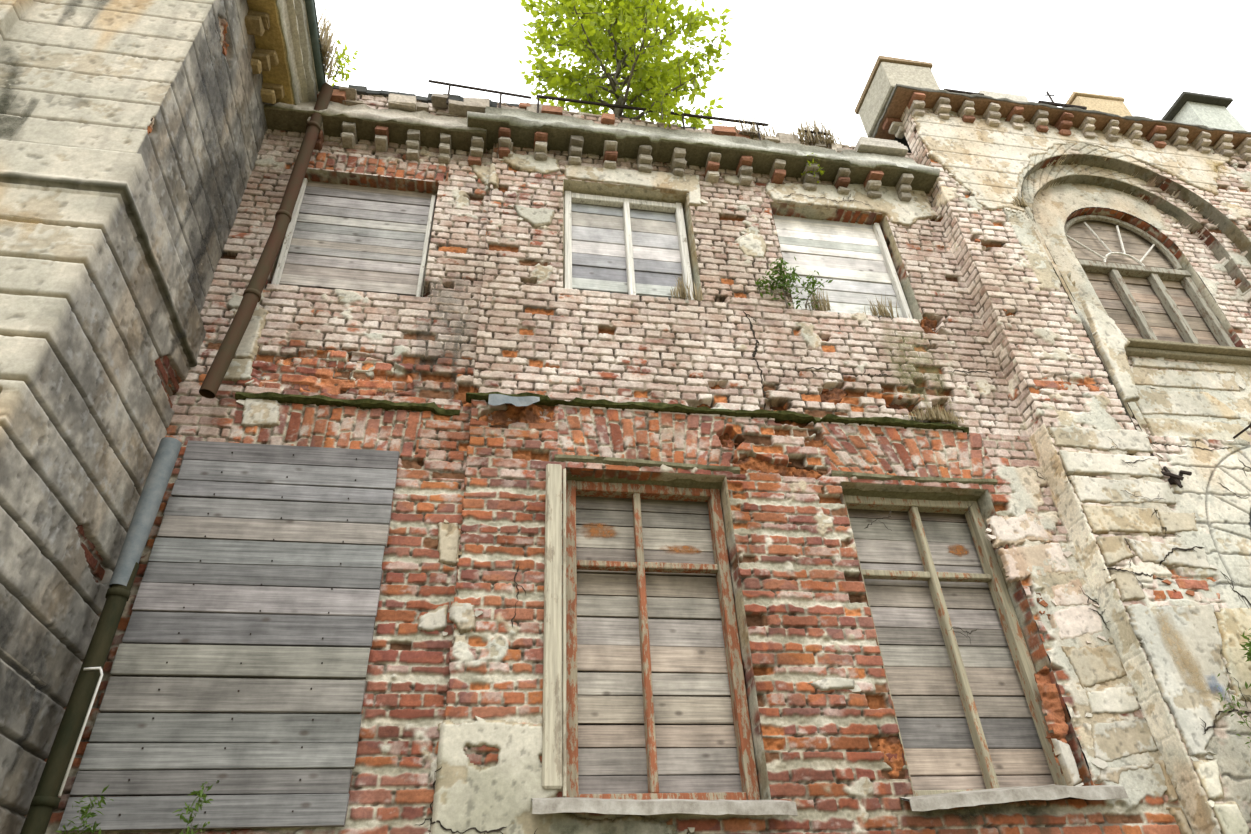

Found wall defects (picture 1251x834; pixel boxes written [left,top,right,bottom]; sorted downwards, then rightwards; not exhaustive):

leakage [0,69,34,135]
leakage [191,162,241,295]
crack [743,311,772,410]
spalling [719,433,822,480]
peeling [1033,272,1251,834]
peeling [985,511,1193,834]
crack [416,767,538,834]